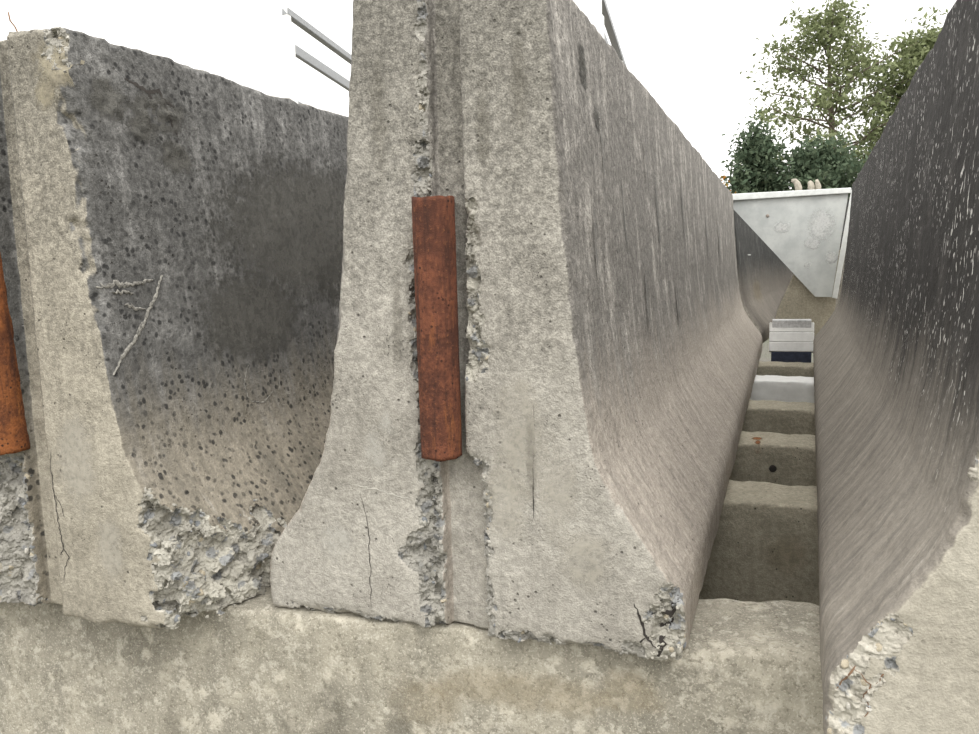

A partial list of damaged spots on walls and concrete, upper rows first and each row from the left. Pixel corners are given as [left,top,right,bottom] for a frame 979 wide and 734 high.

spalling [411,0,434,197]
spalling [0,453,48,607]
spalling [137,487,287,629]
spalling [398,246,448,628]
spalling [470,455,566,645]
spalling [580,582,688,660]
spalling [967,451,979,482]